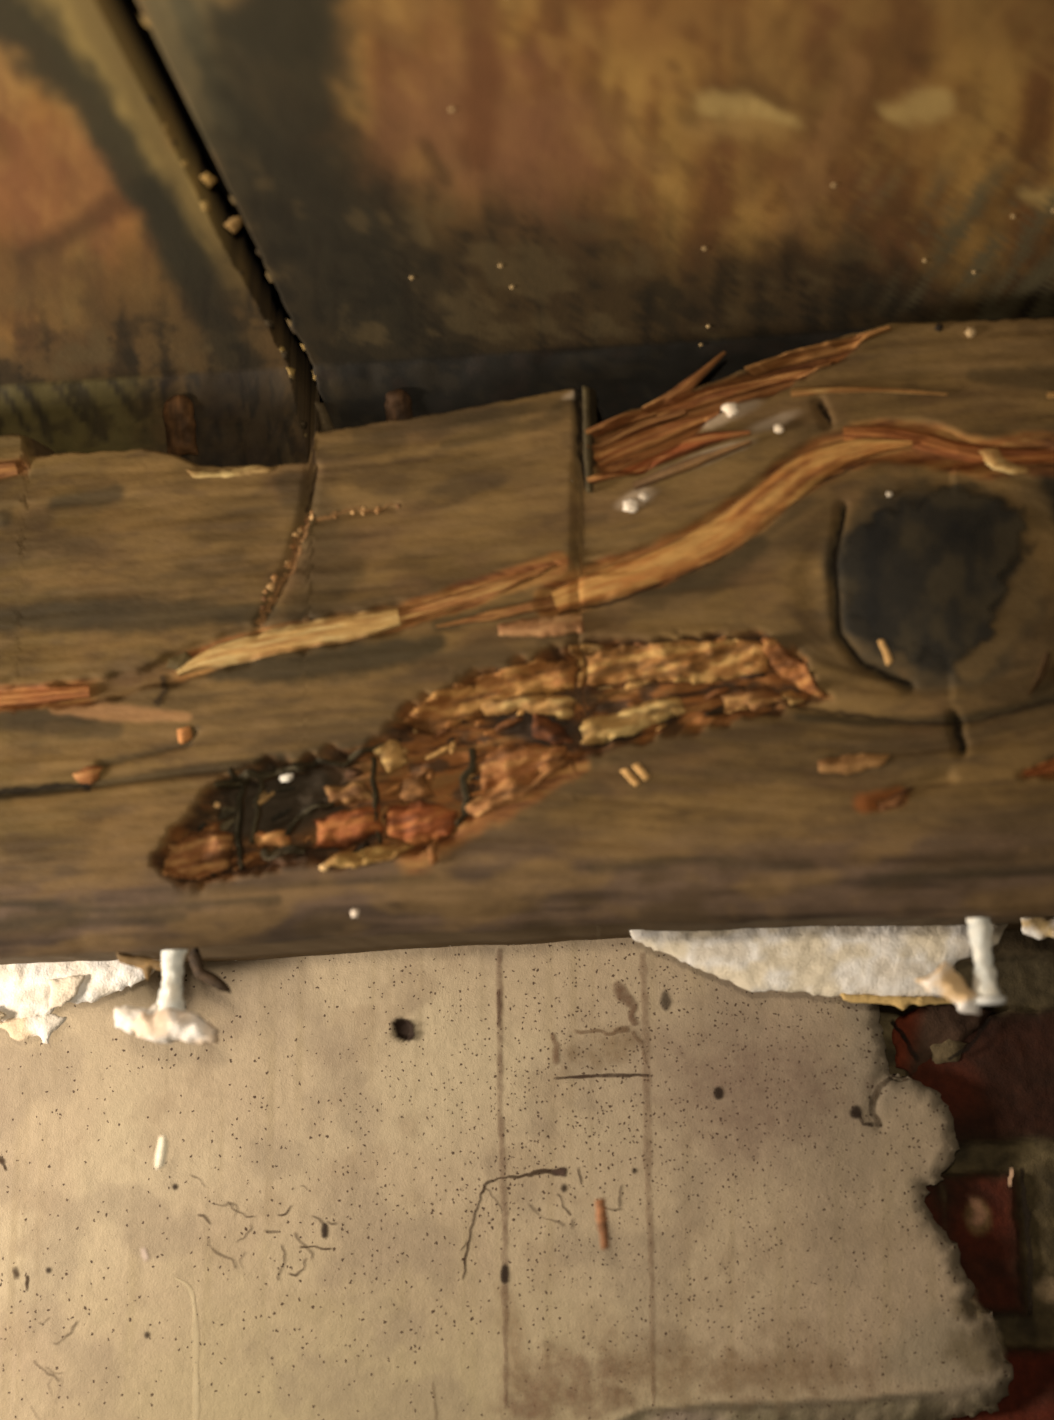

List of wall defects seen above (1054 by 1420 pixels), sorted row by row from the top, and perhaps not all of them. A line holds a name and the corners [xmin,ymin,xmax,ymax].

crack [574,390,586,487]
crack [818,404,831,422]
crack [560,553,727,615]
crack [832,511,910,685]
crack [781,701,1054,750]
peeling [0,975,86,1044]
spalling [840,993,992,1075]
crack [462,1168,581,1277]